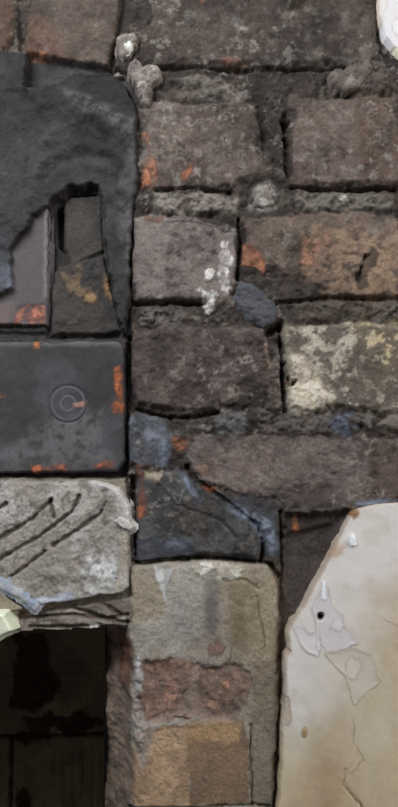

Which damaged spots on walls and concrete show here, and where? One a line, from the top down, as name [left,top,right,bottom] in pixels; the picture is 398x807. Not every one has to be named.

spalling [13,305,45,326]
spalling [60,264,112,302]
peeling [293,580,358,657]
crack [343,712,366,807]